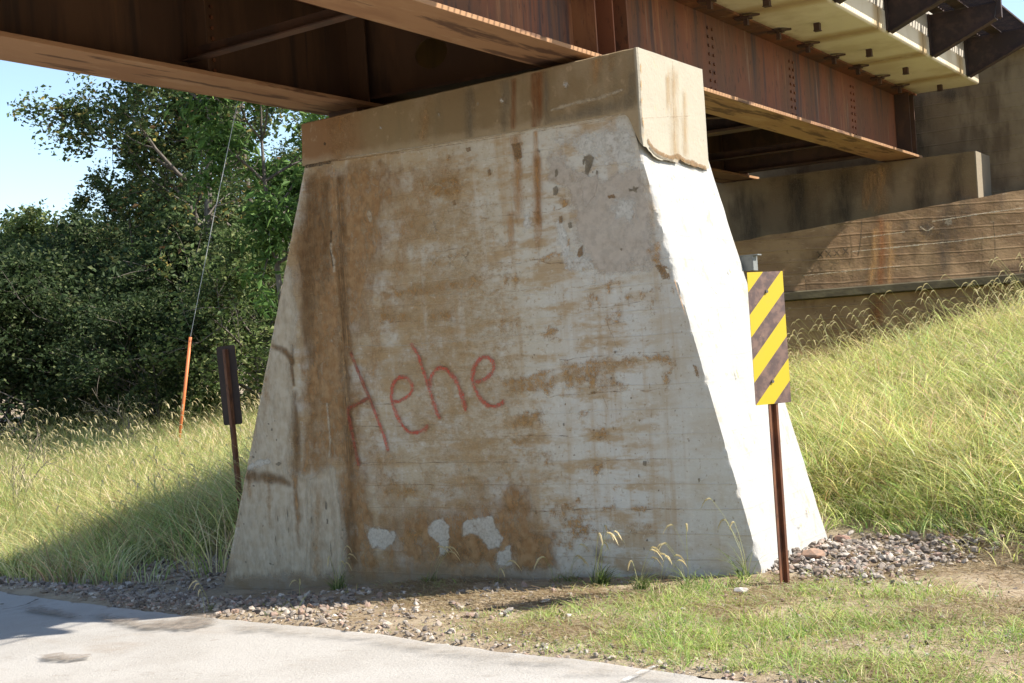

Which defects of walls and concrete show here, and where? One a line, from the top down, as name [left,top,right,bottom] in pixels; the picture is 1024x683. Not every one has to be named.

spalling [512,143,522,159]
spalling [583,154,598,175]
spalling [648,139,707,170]
spalling [553,169,583,257]
spalling [648,243,674,292]
damp [246,167,676,572]